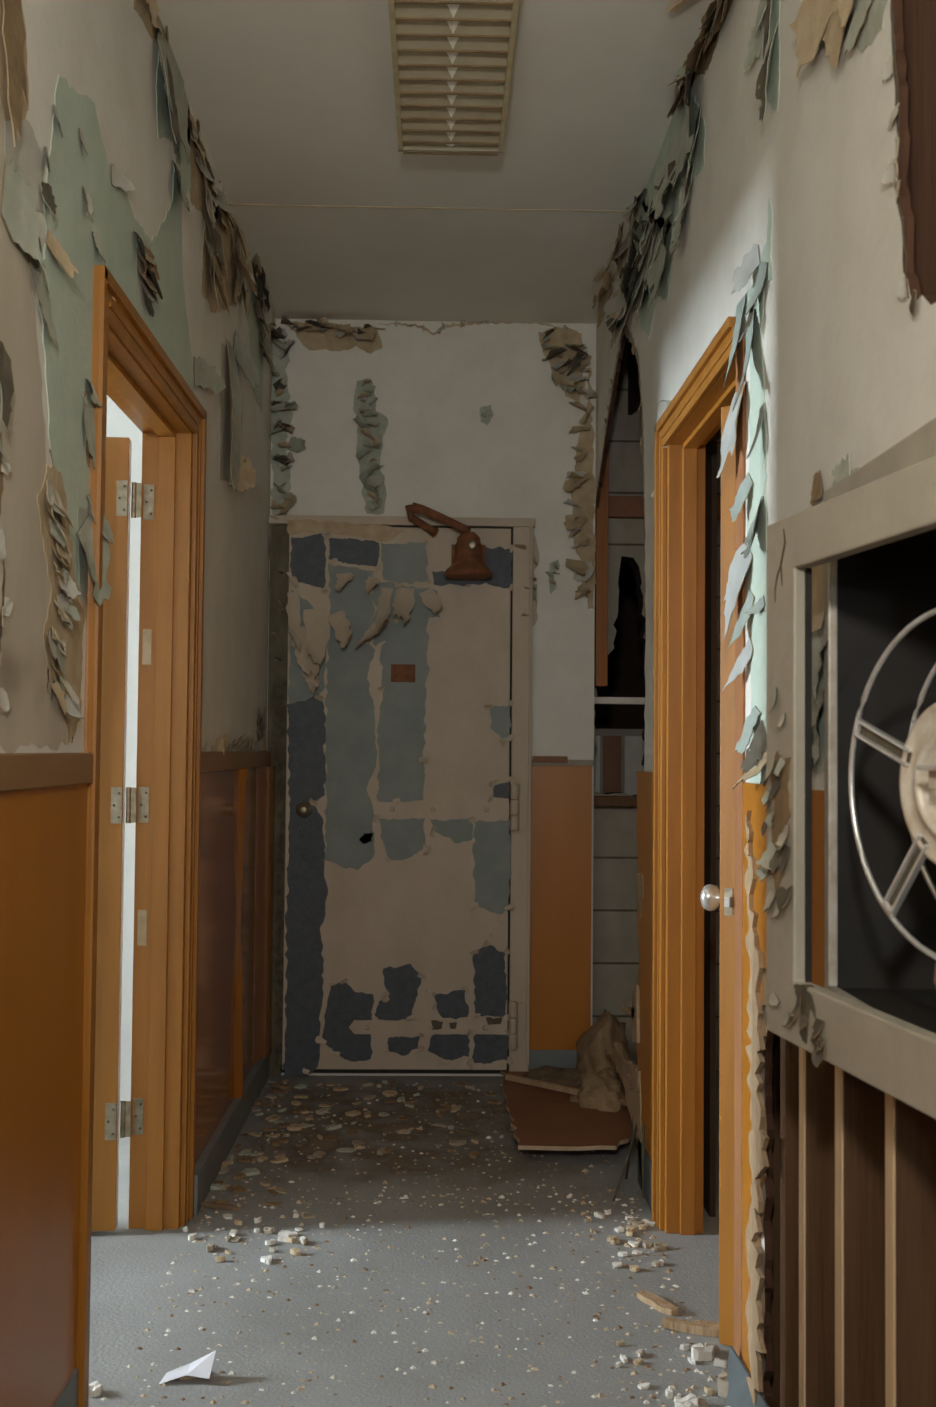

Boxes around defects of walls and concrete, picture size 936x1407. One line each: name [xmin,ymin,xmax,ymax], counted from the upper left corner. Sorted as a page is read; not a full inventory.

peeling [744,0,888,123]
peeling [0,0,733,1078]
peeling [716,198,793,919]
peeling [810,453,860,506]
peeling [812,564,828,774]
peeling [769,984,825,1068]